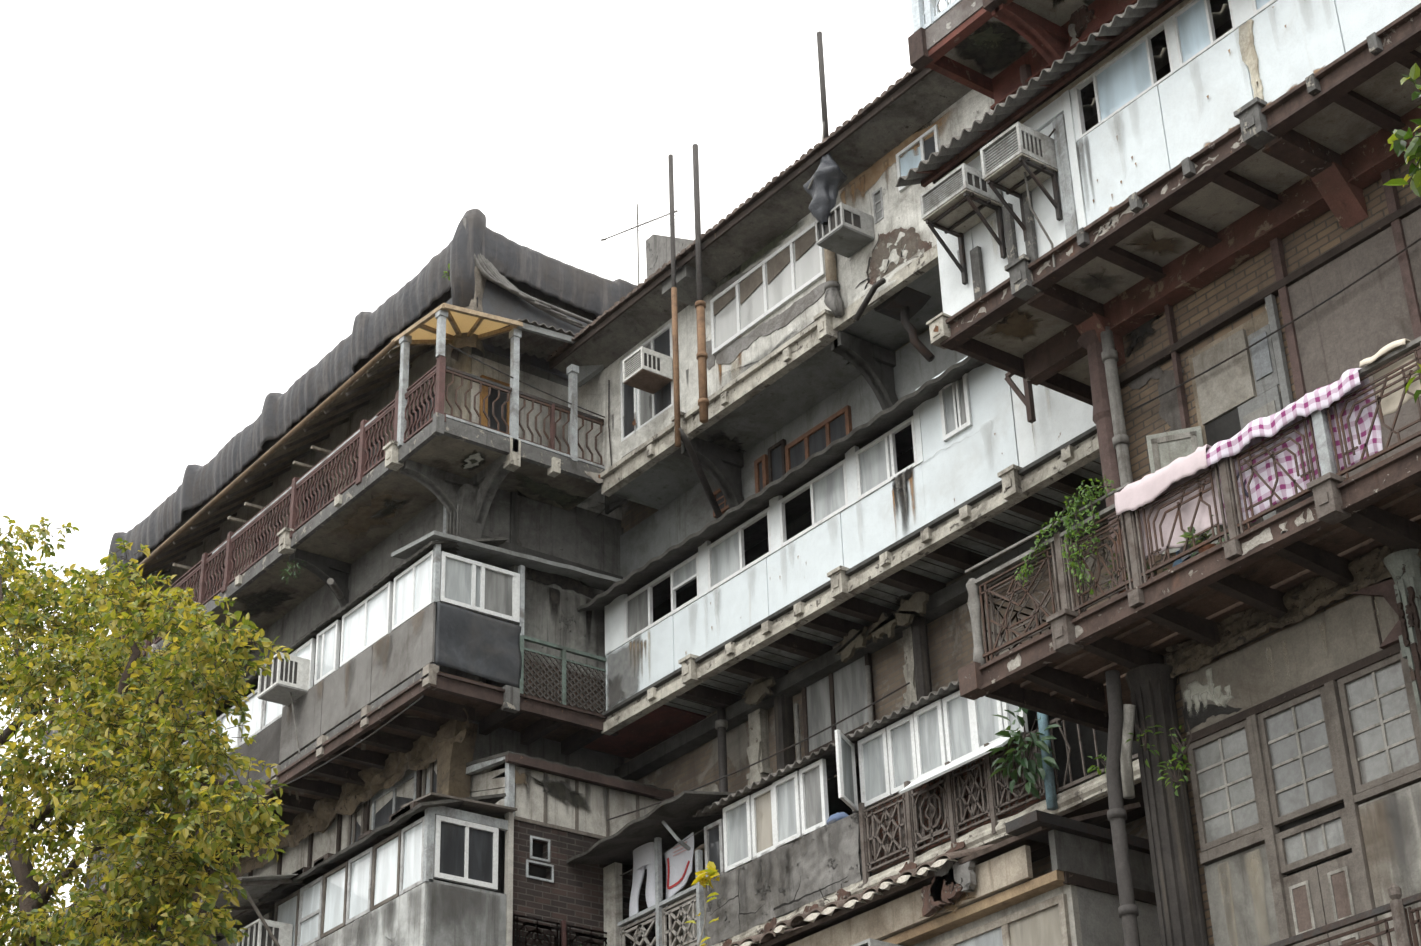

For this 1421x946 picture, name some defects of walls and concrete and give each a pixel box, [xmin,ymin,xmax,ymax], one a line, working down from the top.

peeling [867,227,932,285]
water stain [892,471,915,528]
peeling [1183,668,1242,732]
spalling [837,888,851,901]
spalling [921,842,977,917]
spalling [759,917,777,934]